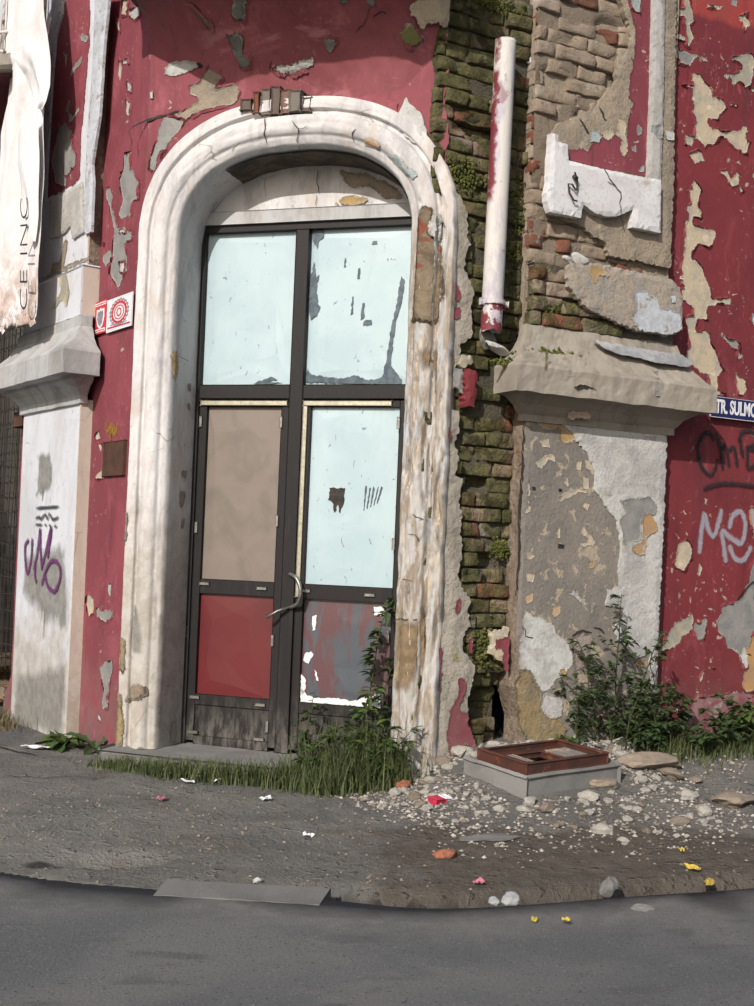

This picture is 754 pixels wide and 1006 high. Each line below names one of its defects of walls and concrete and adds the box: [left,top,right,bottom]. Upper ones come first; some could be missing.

peeling [115,0,140,33]
peeling [39,239,89,310]
peeling [51,100,79,188]
peeling [103,150,140,289]
peeling [147,57,314,172]
peeling [590,0,754,164]
peeling [630,177,749,397]
peeling [718,168,745,195]
peeling [619,496,658,556]
peeling [671,538,702,576]
peeling [514,573,593,742]
peeling [659,555,754,735]